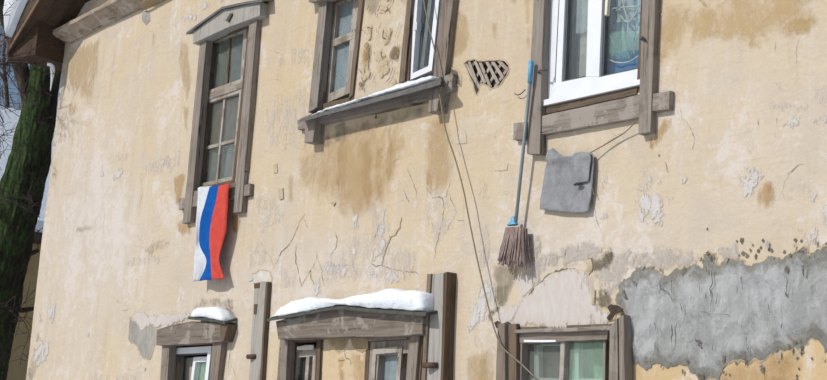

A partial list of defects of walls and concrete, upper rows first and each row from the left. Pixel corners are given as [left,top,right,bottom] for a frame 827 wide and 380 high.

crack [274,171,464,285]
peeling [638,173,671,226]
spalling [128,312,191,372]
spalling [466,204,827,380]